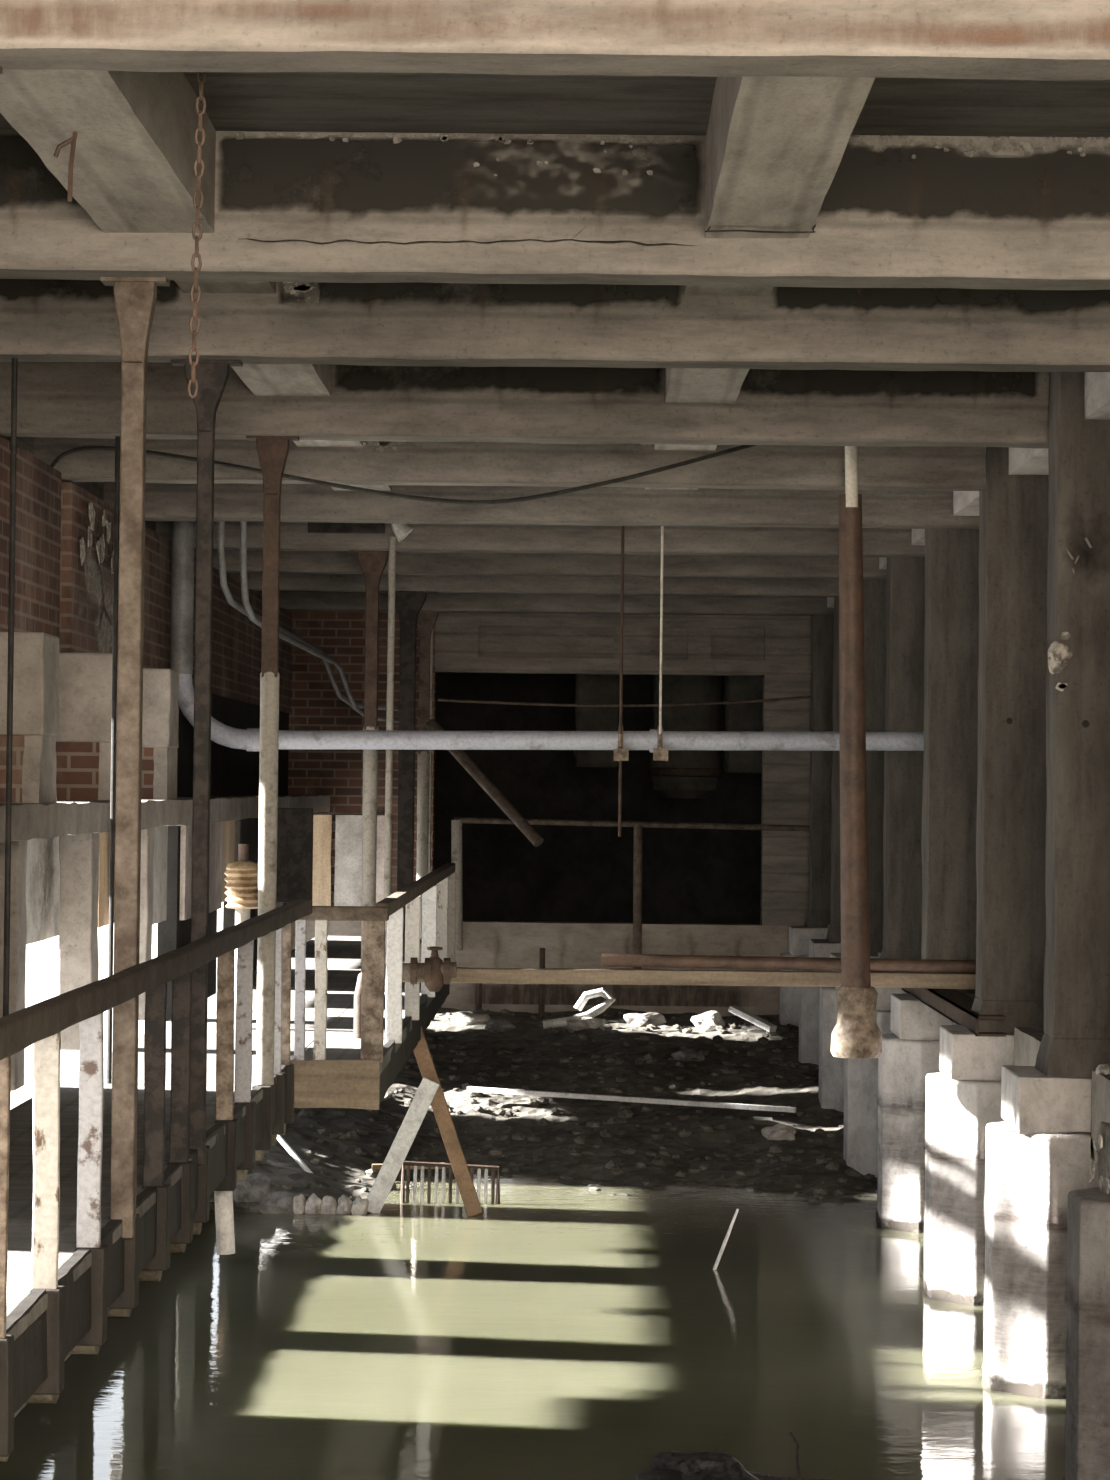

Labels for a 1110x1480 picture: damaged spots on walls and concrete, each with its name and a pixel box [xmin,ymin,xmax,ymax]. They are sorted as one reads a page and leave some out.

peeling [236,132,678,176]